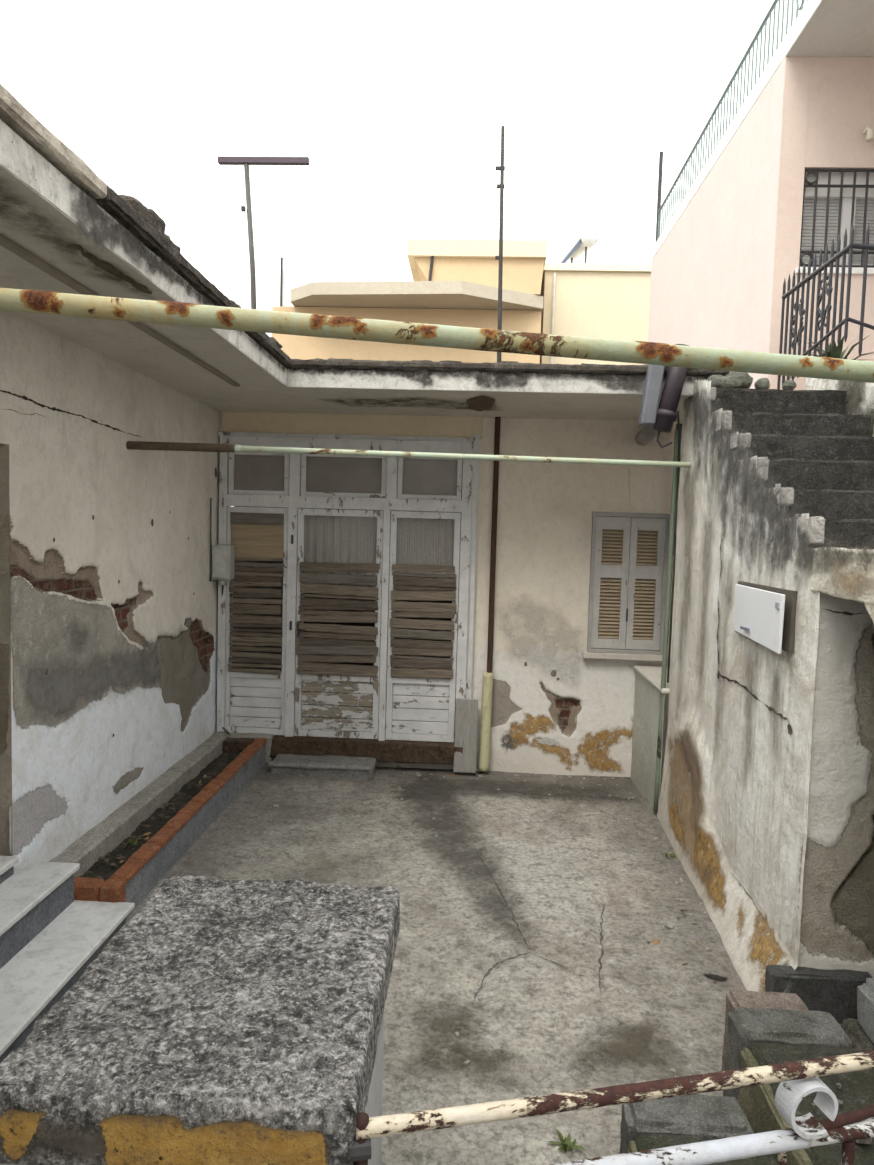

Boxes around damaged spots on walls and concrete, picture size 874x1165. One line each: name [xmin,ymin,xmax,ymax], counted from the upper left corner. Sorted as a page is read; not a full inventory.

leakage [71,185,217,306]
crack [0,390,143,438]
leakage [241,331,646,409]
leakage [680,375,874,673]
peeling [0,515,215,754]
crack [717,539,792,734]
spalling [540,670,582,736]
leakage [745,657,757,770]
peeling [798,623,874,962]
crack [473,848,570,1005]
crack [597,903,605,996]
peeling [0,1108,328,1165]